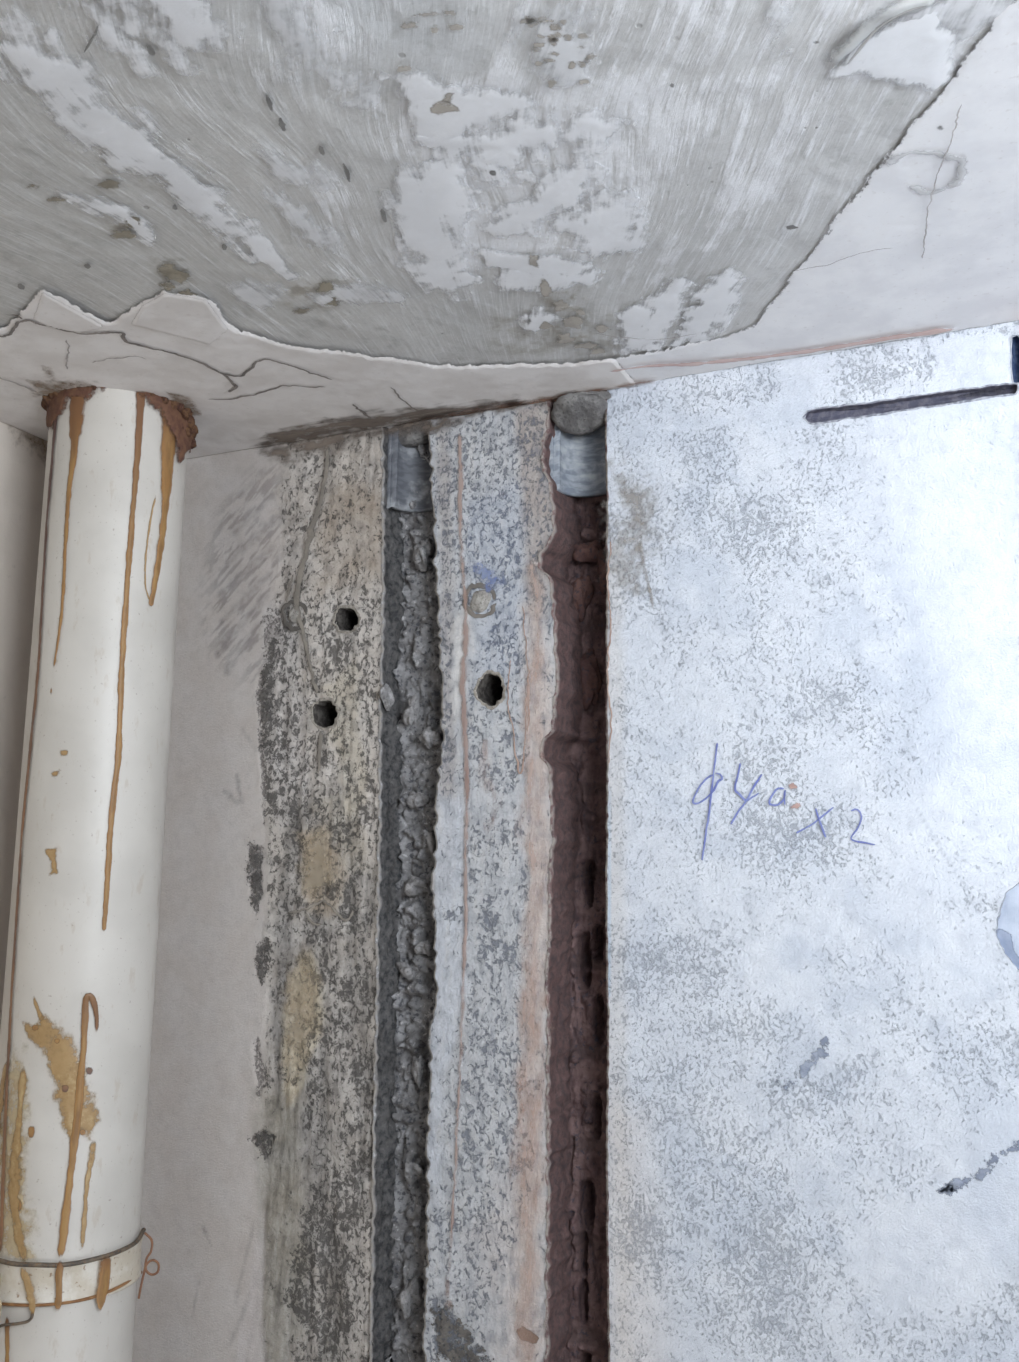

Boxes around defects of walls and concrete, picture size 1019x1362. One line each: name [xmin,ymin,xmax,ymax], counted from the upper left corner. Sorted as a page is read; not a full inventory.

crack [0,314,331,400]
flaking render [0,0,1019,459]